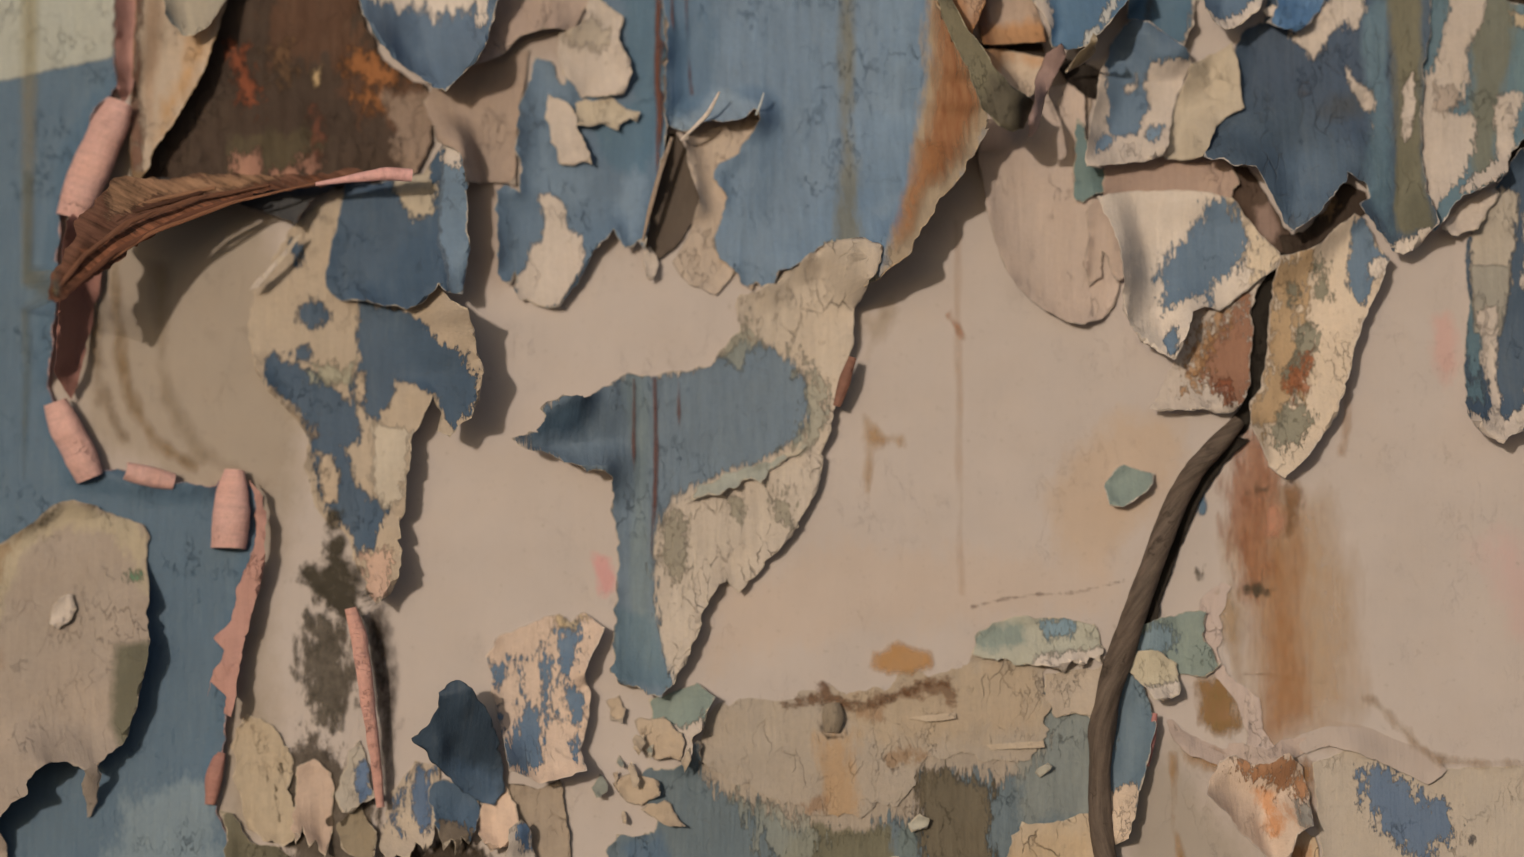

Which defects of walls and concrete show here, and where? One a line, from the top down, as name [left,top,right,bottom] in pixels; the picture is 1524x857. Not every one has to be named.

corrosion [905,2,978,228]
peeling [0,0,673,857]
peeling [512,0,1524,857]
corrosion [1199,678,1241,734]
corrosion [1230,441,1335,722]